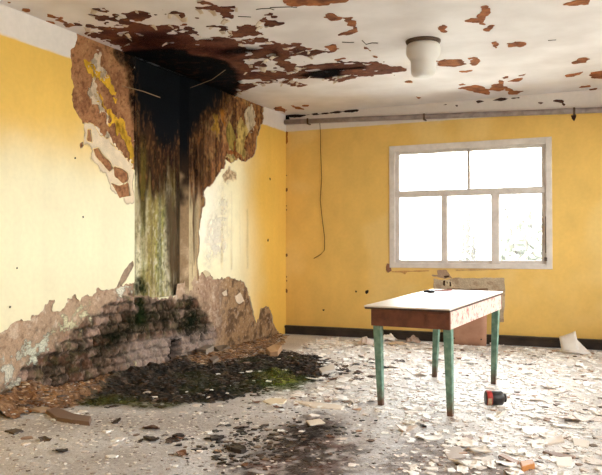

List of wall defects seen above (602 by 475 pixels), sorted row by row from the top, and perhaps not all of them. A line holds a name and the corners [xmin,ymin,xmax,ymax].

peeling [465,5,495,32]
peeling [436,57,480,73]
peeling [458,74,525,95]
peeling [565,71,602,90]
leakage [93,49,233,357]
spalling [0,0,407,395]
leakage [1,304,92,391]